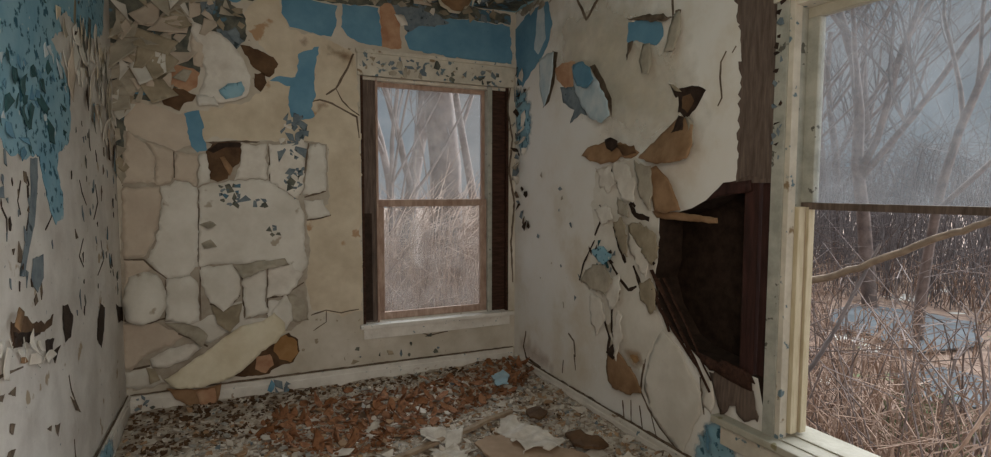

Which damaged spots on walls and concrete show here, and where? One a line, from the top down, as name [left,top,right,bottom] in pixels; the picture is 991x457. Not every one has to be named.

crack [313,54,360,138]
peeling [511,51,612,238]
crack [577,0,598,21]
flaking render [578,0,786,393]